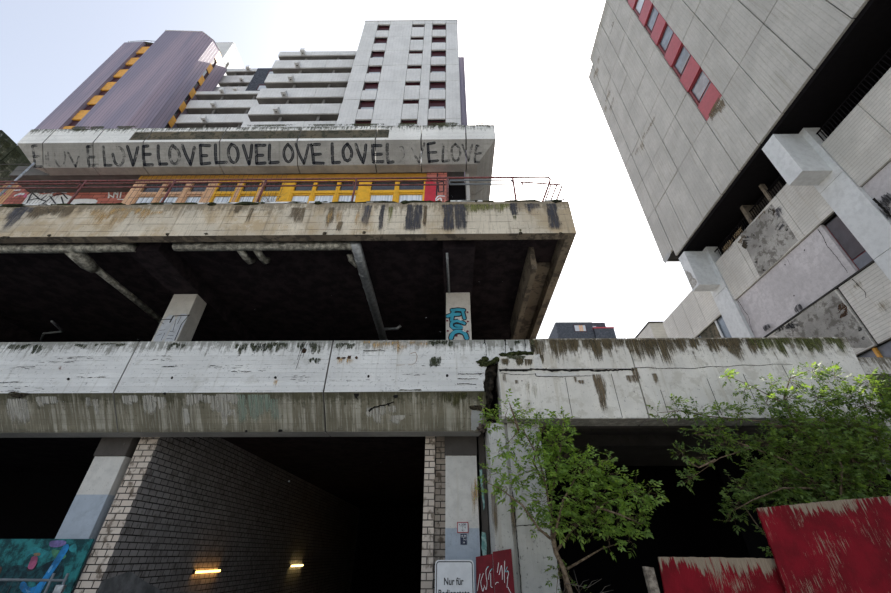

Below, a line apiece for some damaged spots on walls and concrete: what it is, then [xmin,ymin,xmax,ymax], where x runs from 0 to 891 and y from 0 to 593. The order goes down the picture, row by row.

water stain [290,207,305,220]
water stain [326,207,343,231]
water stain [362,205,393,229]
water stain [405,204,427,230]
water stain [442,203,562,231]
peeling [740,204,805,276]
peeling [774,291,873,348]
water stain [235,342,321,363]
crack [457,339,792,385]
water stain [502,304,845,384]
water stain [442,392,467,406]
water stain [574,374,606,407]